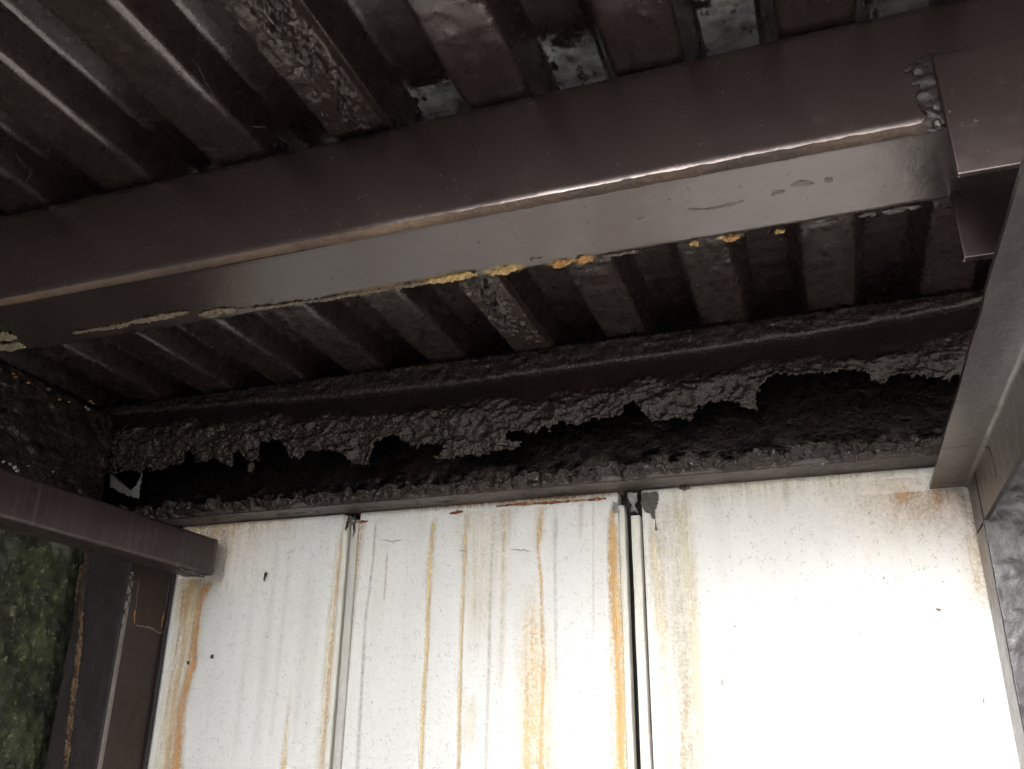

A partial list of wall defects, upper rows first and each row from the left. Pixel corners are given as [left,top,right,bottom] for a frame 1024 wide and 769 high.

peeling [73,272,478,334]
peeling [110,471,143,499]
corrosion [443,495,606,514]
corrosion [63,551,88,769]
corrosion [159,580,210,769]
corrosion [525,627,544,769]
corrosion [609,511,625,769]